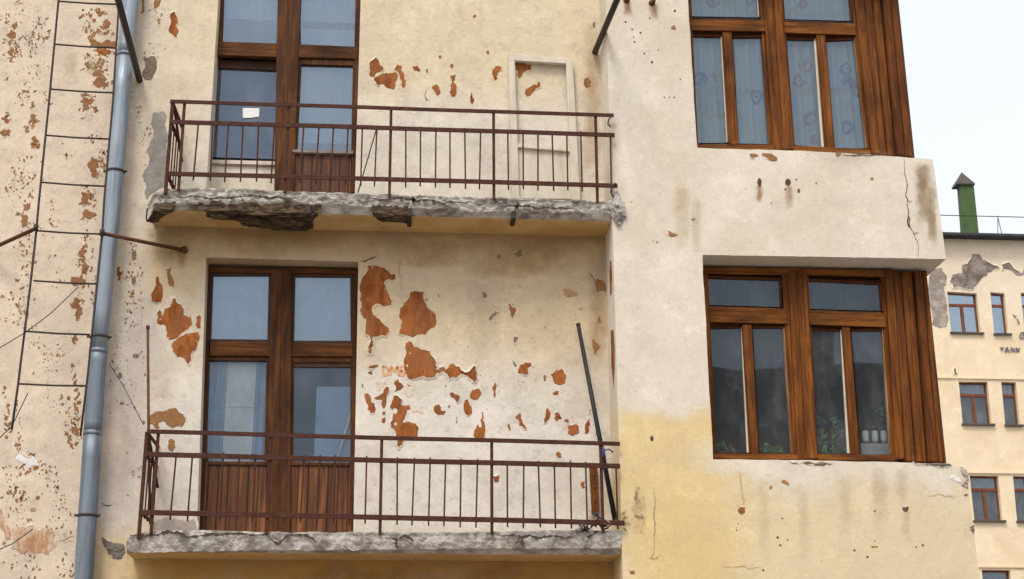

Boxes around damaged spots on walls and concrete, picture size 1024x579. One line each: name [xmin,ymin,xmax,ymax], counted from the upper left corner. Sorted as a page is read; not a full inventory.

peeling [78,8,116,119]
peeling [369,56,428,90]
peeling [0,0,82,449]
peeling [52,134,107,321]
spalling [198,201,321,231]
crack [847,154,919,251]
water stain [918,166,935,234]
peeling [110,243,201,390]
peeling [359,263,590,452]
spalling [927,252,1024,328]
crack [389,535,414,549]
crack [498,534,572,548]